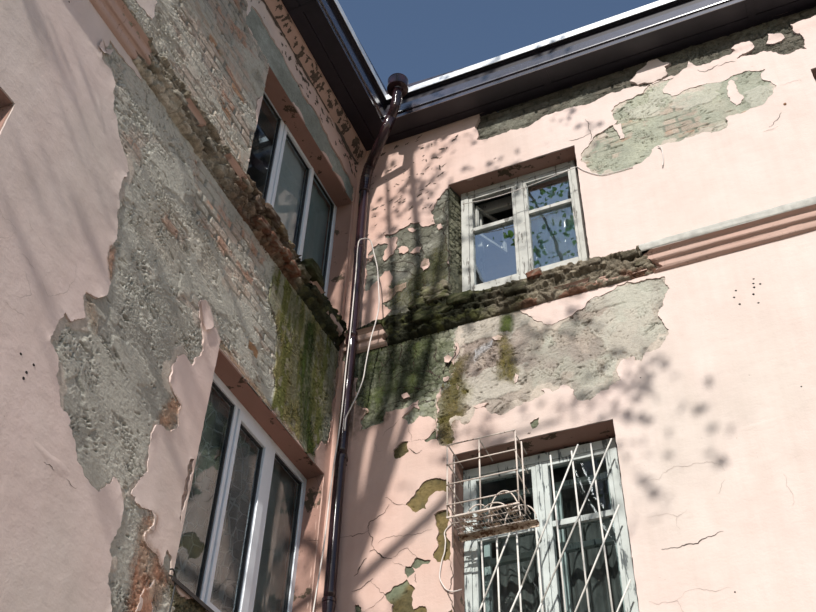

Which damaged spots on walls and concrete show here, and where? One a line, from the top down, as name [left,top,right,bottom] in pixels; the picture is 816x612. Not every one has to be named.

spalling [581,70,776,176]
spalling [50,0,363,612]
peeling [365,135,475,316]
spalling [501,267,543,298]
spalling [579,257,601,270]
water stain [436,337,516,445]
spalling [425,277,669,446]
crack [346,497,424,609]
peeling [386,511,454,612]
peeling [407,479,449,513]
crack [655,511,721,550]